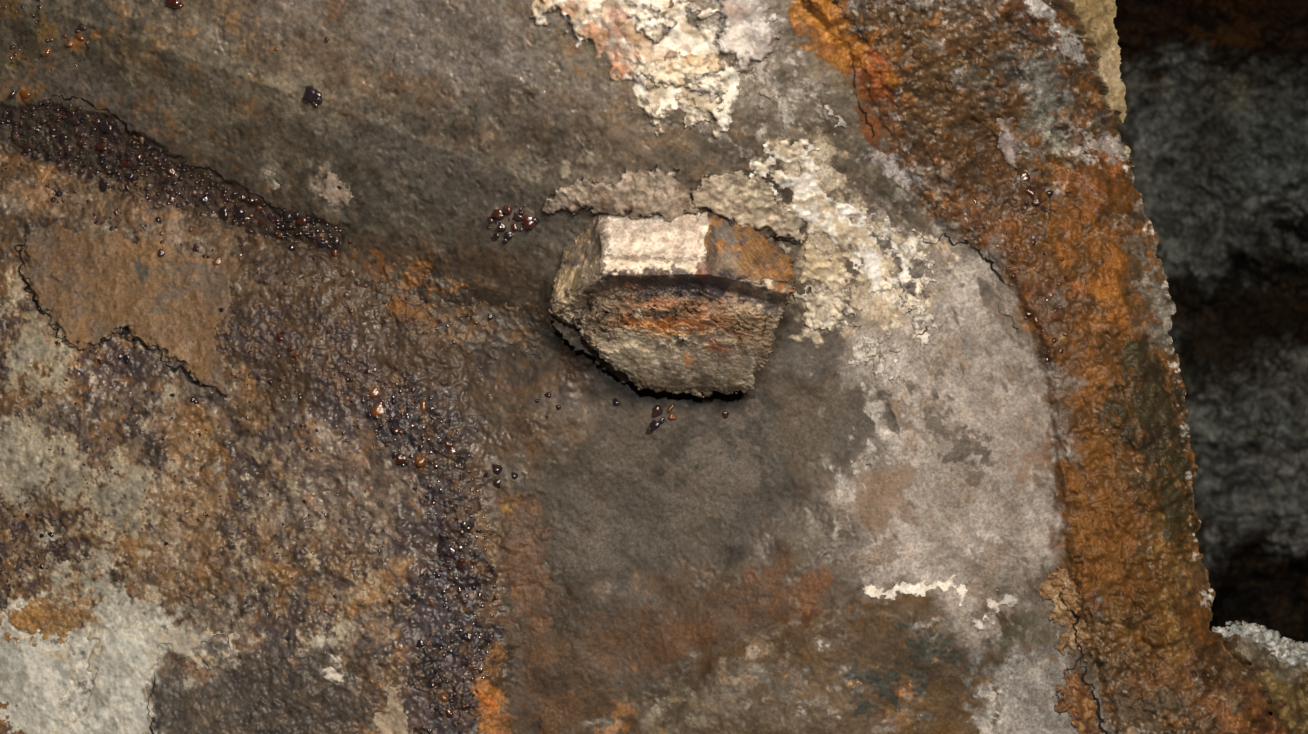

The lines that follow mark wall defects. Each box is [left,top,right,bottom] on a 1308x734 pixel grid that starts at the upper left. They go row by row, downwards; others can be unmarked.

rust [0,0,90,82]
rust [302,86,323,107]
rust [788,0,904,156]
leakage [1069,123,1129,168]
rust [1113,0,1308,84]
rust [0,90,676,734]
leakage [491,0,1097,734]
rust [972,163,1308,612]
rust [674,575,1004,734]
rust [1189,517,1308,665]